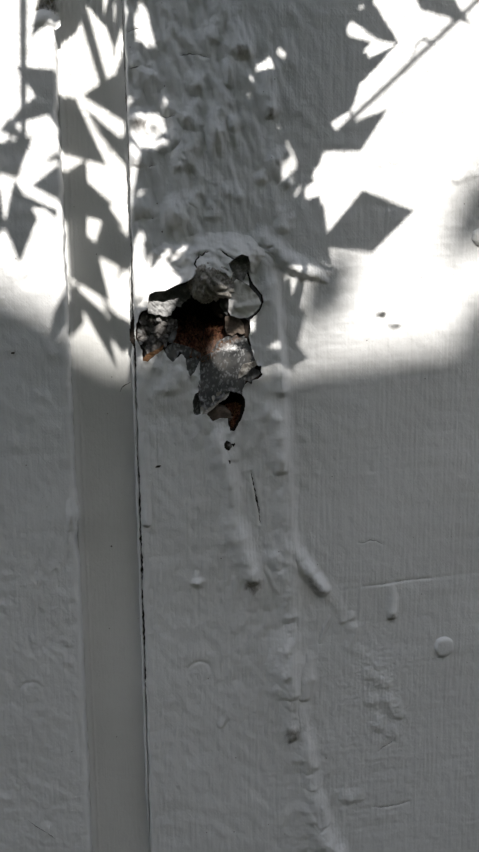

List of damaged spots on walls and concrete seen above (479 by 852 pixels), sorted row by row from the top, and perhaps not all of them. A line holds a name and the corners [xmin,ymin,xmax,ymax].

peeling [129,231,265,431]